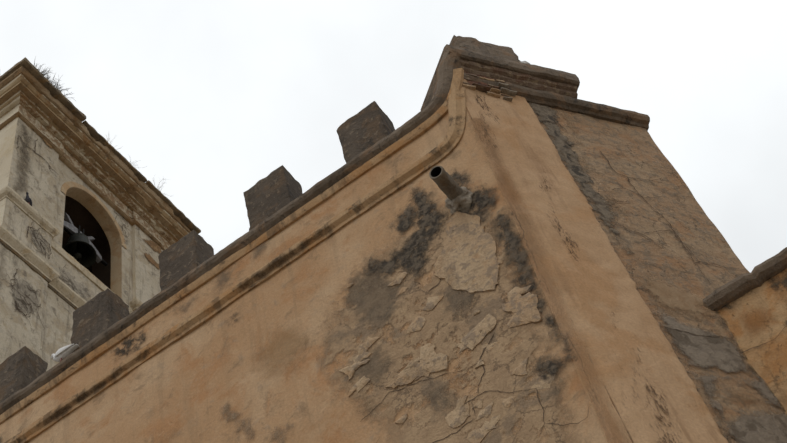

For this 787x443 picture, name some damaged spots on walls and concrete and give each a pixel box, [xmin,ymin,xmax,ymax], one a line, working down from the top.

leakage [39,370,121,424]
leakage [115,333,146,360]
leakage [239,239,311,290]
leakage [354,350,387,382]
leakage [348,188,447,323]
flaking render [319,203,575,443]
crack [360,334,589,443]
leakage [450,171,575,379]
crack [591,151,739,283]